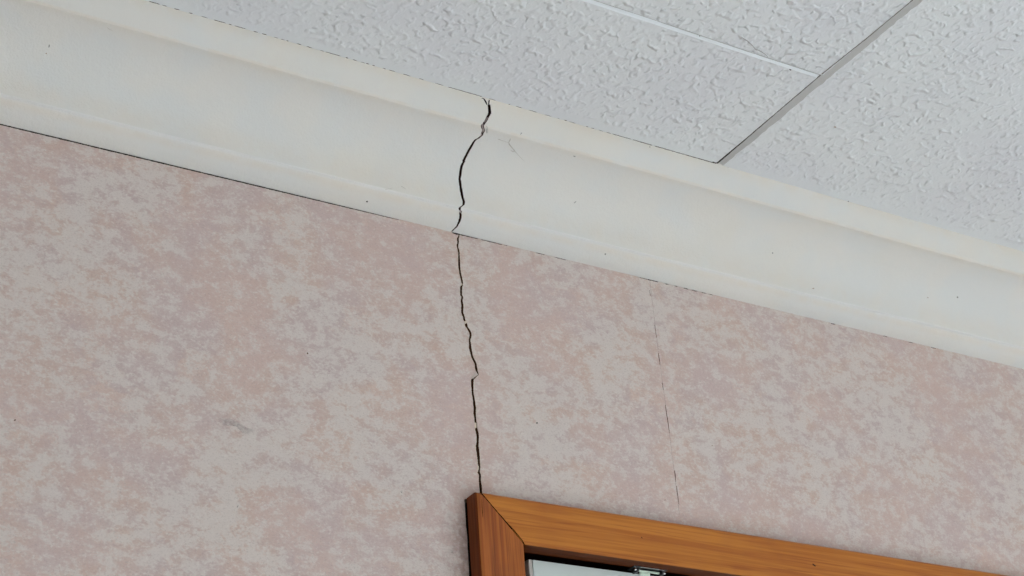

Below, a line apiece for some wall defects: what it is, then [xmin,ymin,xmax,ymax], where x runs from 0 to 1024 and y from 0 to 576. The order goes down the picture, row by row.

crack [149,0,913,576]